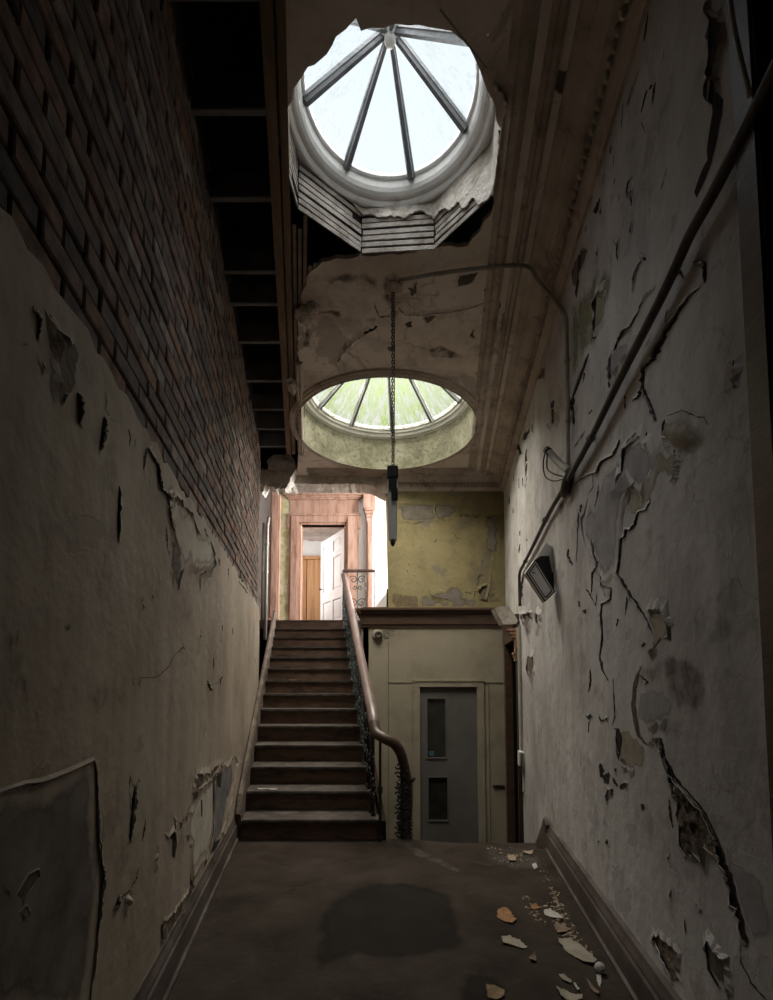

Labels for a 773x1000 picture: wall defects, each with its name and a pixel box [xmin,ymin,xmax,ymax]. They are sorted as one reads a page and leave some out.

spalling [694,0,727,198]
peeling [38,309,78,406]
peeling [166,488,216,589]
peeling [417,493,514,608]
peeling [584,713,644,805]
peeling [0,757,102,1000]
peeling [160,755,241,944]
damp [318,884,460,963]
peeling [650,927,682,988]
crack [648,737,766,999]
spalling [666,782,768,934]
peeling [702,928,733,1000]